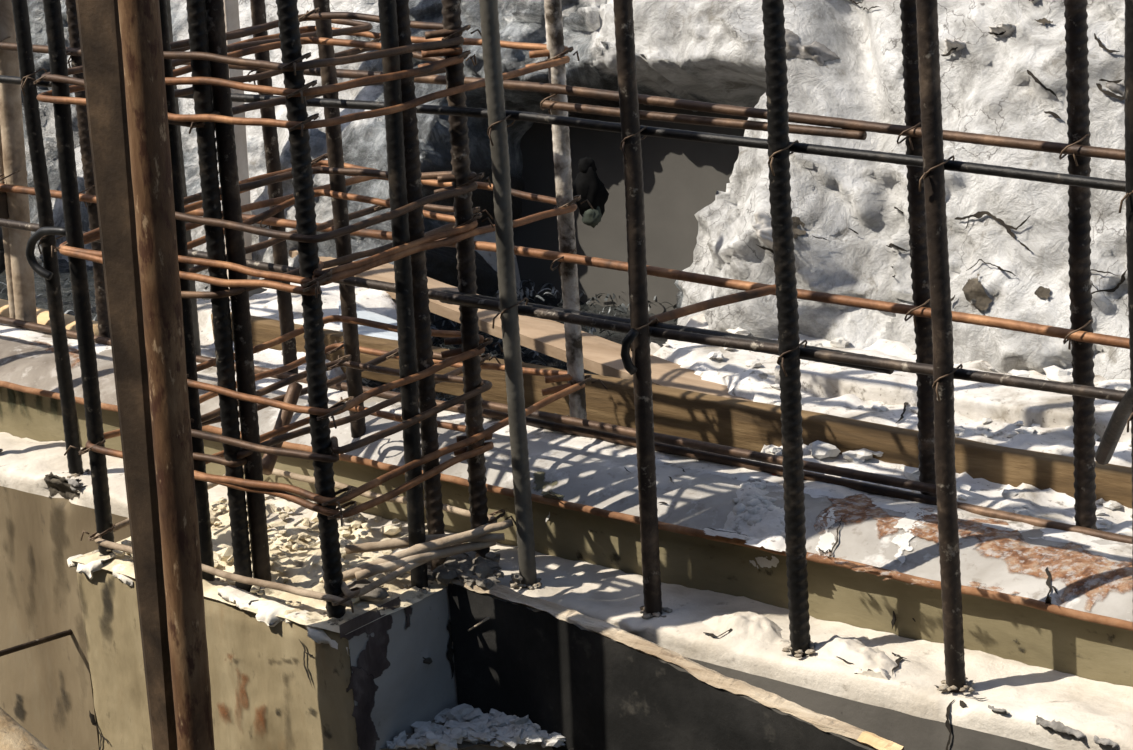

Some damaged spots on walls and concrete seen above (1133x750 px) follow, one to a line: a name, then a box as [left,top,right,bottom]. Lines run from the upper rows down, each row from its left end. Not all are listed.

spalling [159,0,175,77]
crack [955,211,1030,276]
crack [1090,269,1127,294]
corrosion [814,494,939,544]
leakage [101,580,112,628]
peeling [195,414,413,750]
corrosion [808,552,932,584]
corrosion [958,518,1133,611]
leakage [14,694,24,720]
crack [934,685,985,750]
spalling [1036,716,1119,749]